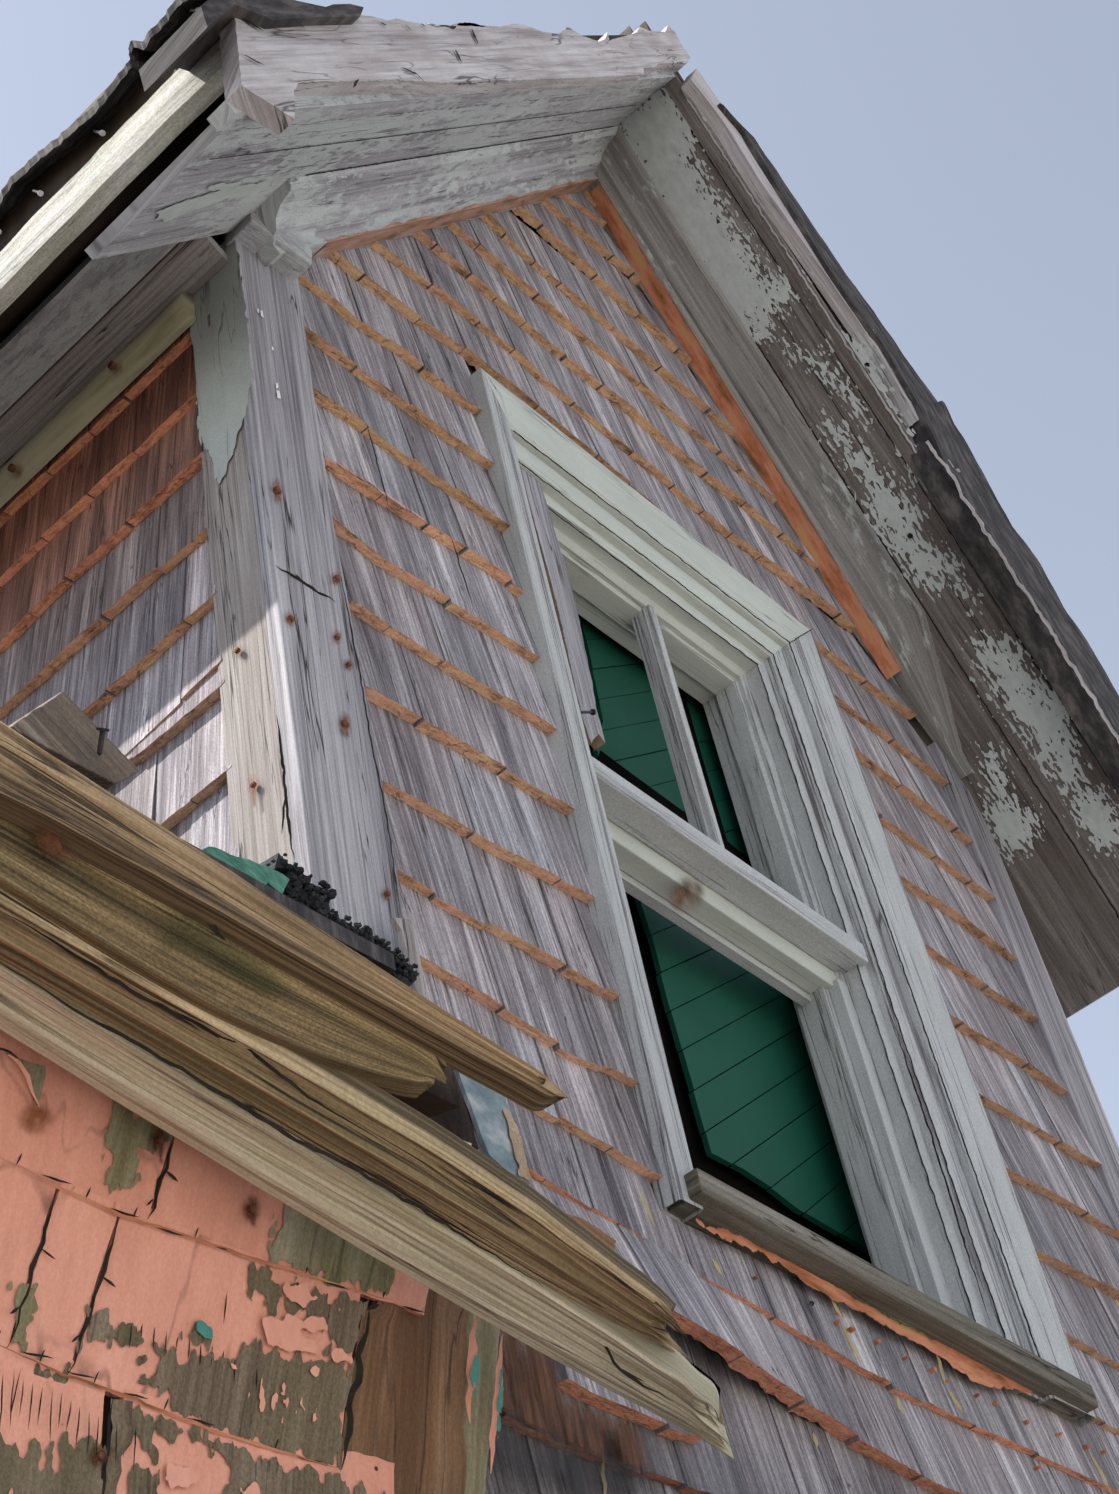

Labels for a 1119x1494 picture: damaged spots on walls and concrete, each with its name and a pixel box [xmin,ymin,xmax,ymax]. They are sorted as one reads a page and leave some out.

peeling [190,241,264,484]
peeling [618,87,1119,866]
crack [276,562,400,911]
corrosion [674,882,701,907]
peeling [0,1048,46,1107]
peeling [102,1101,173,1194]
crack [0,911,540,1284]
peeling [0,1204,395,1494]
crack [0,1141,426,1494]
crack [604,1346,673,1401]
peeling [696,1218,1033,1394]